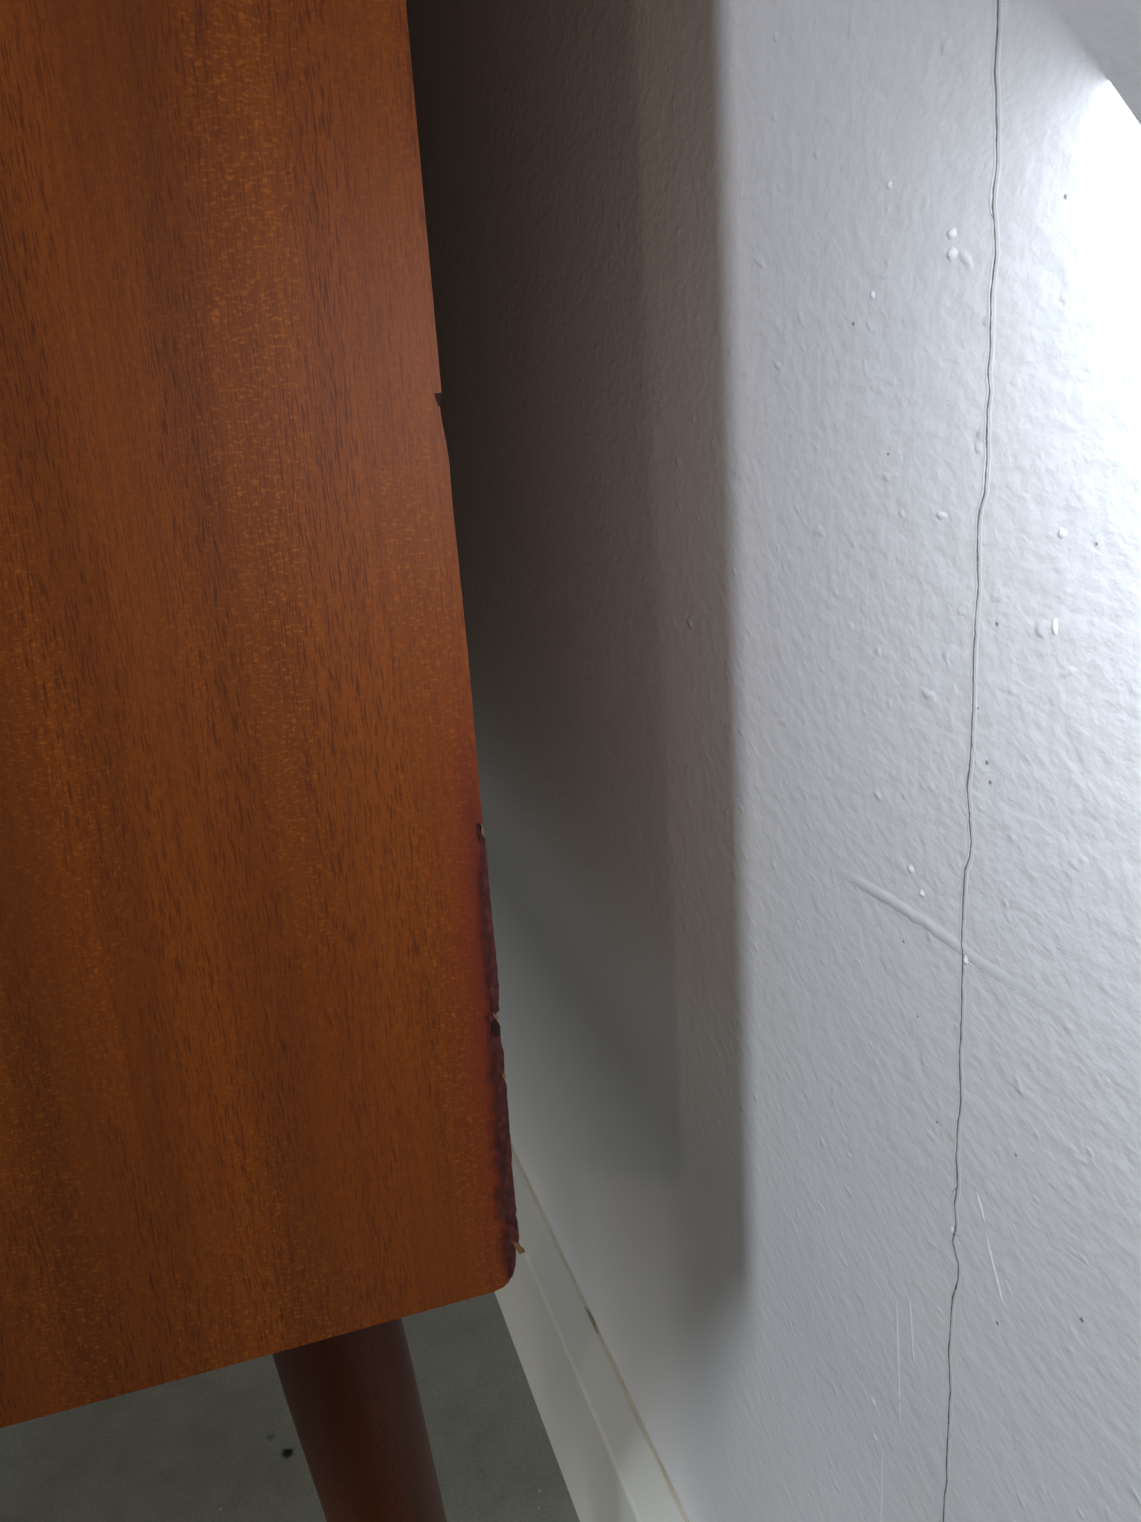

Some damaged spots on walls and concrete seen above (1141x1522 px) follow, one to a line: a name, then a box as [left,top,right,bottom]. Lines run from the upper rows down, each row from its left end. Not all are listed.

crack [941,0,1003,1522]